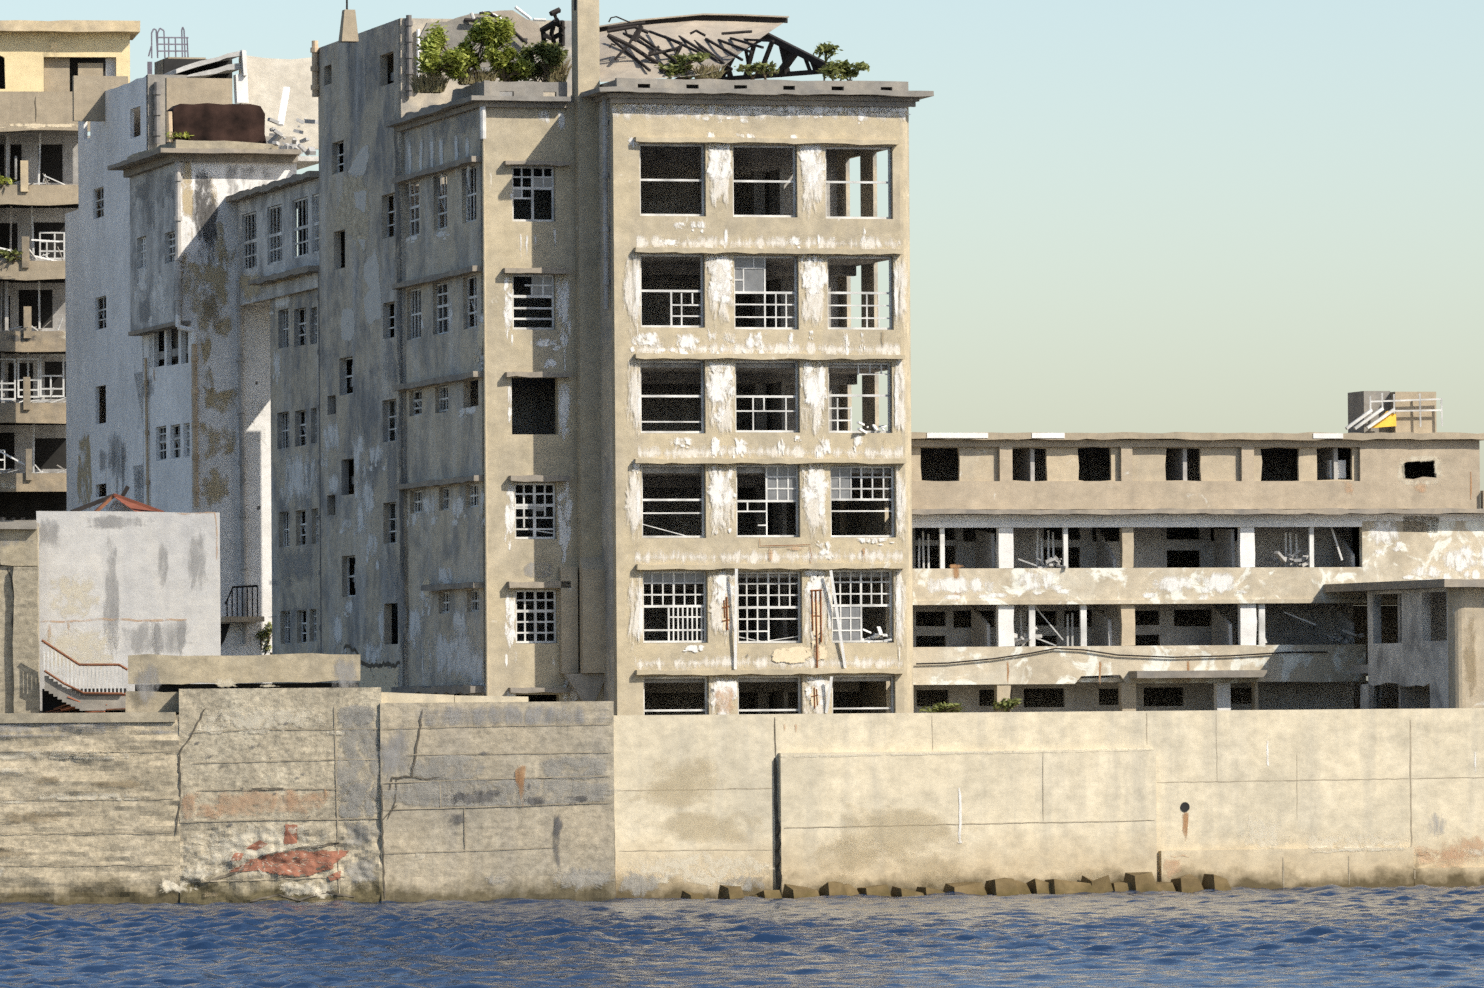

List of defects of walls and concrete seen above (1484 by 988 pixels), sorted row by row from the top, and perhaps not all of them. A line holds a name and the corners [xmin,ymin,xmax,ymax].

peeling [624,104,761,186]
peeling [706,230,733,303]
peeling [790,235,835,295]
peeling [630,265,764,534]
peeling [789,330,831,515]
damp [107,559,118,640]
damp [133,621,186,652]
peeling [928,572,1069,600]
crack [176,708,206,835]
crack [209,710,440,902]
peeling [163,868,217,895]
flaking render [230,816,376,902]